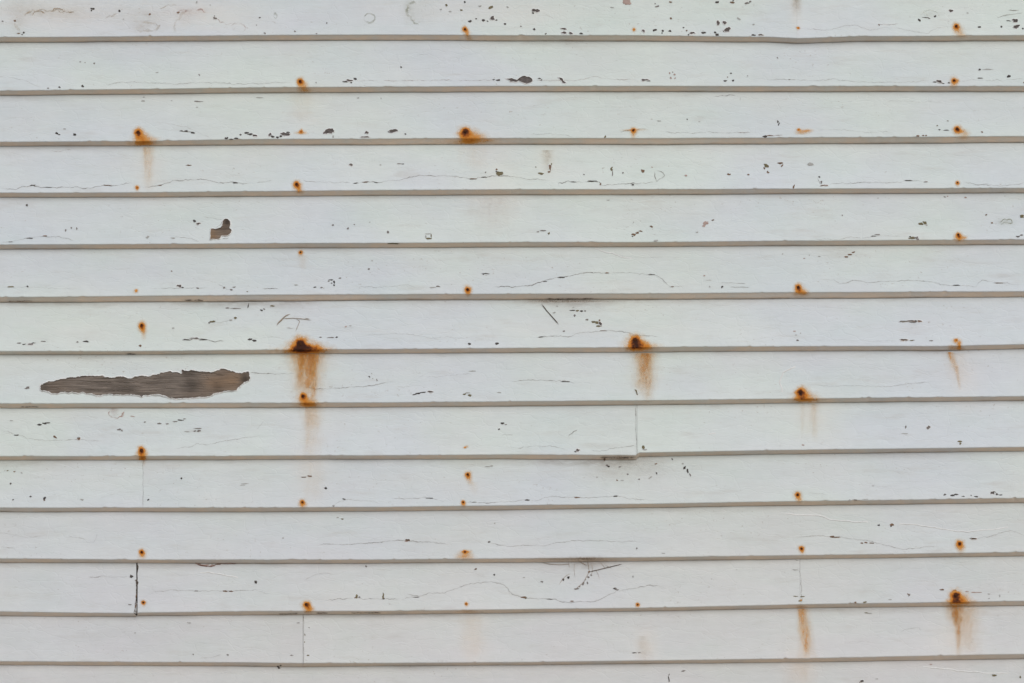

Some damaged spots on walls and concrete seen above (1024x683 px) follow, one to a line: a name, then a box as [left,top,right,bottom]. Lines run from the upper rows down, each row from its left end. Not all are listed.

rust [134,128,153,146]
rust [458,127,488,144]
peeling [193,218,233,240]
rust [627,335,652,371]
peeling [24,368,251,400]
rust [285,337,327,407]
rust [794,387,817,402]
rust [947,591,969,621]